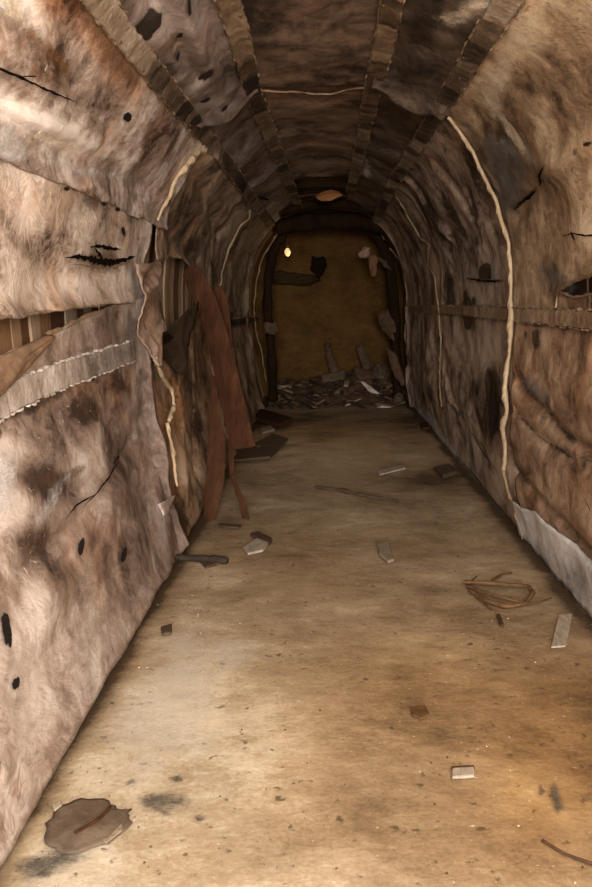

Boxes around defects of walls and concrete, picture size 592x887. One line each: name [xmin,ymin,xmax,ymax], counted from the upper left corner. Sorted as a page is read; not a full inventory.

crack [0,68,75,102]
peeling [0,335,56,397]
crack [65,436,131,520]